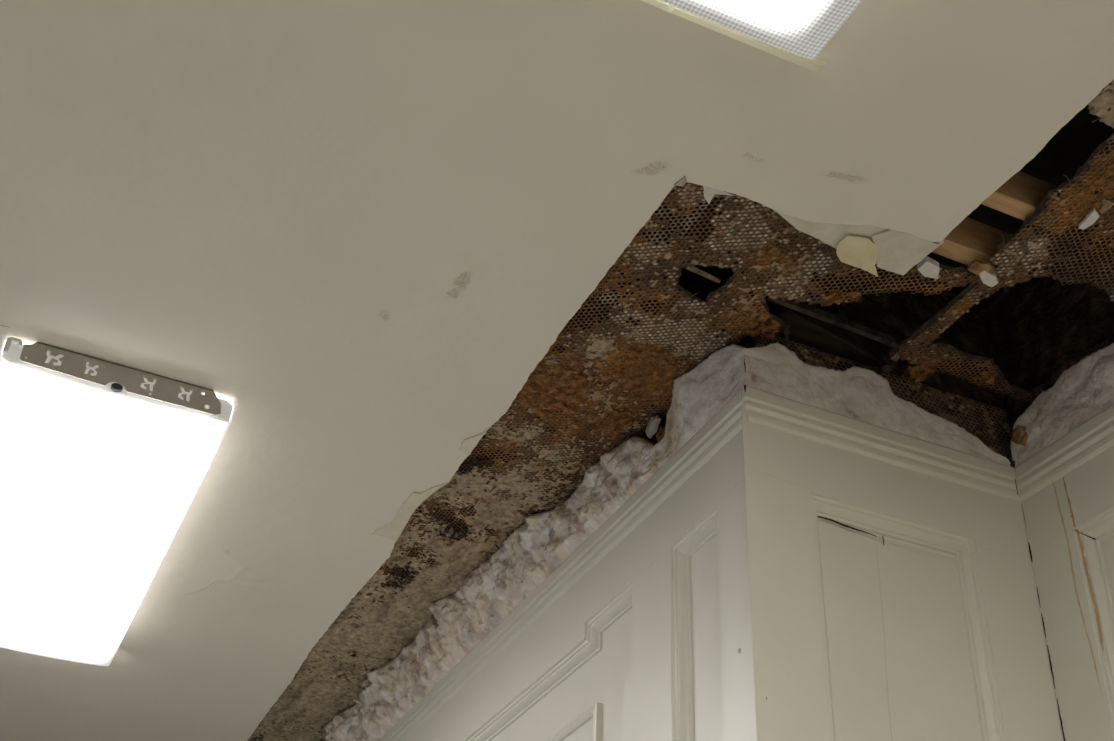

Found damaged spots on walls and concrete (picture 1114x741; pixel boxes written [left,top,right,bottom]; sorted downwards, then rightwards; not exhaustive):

spalling [703,186,734,204]
spalling [1078,208,1099,230]
spalling [917,256,940,279]
spalling [967,259,998,287]
corrosion [743,311,781,339]
leakage [434,520,473,542]
spalling [325,342,1114,741]
leakage [386,565,415,591]